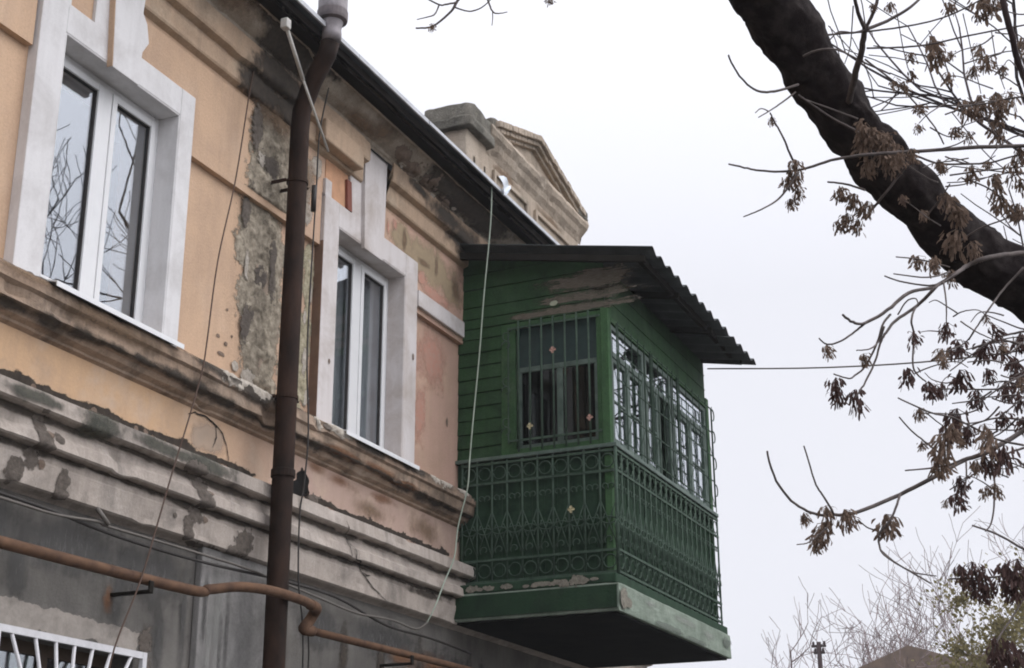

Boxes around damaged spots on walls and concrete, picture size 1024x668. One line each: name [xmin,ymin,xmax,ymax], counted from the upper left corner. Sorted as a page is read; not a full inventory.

flaking render [216,103,290,402]
flaking render [297,244,314,410]
flaking render [305,156,322,226]
water stain [409,164,511,255]
peeling [511,263,642,320]
flaking render [0,369,256,477]
flaking render [305,493,449,556]
spalling [465,574,599,593]